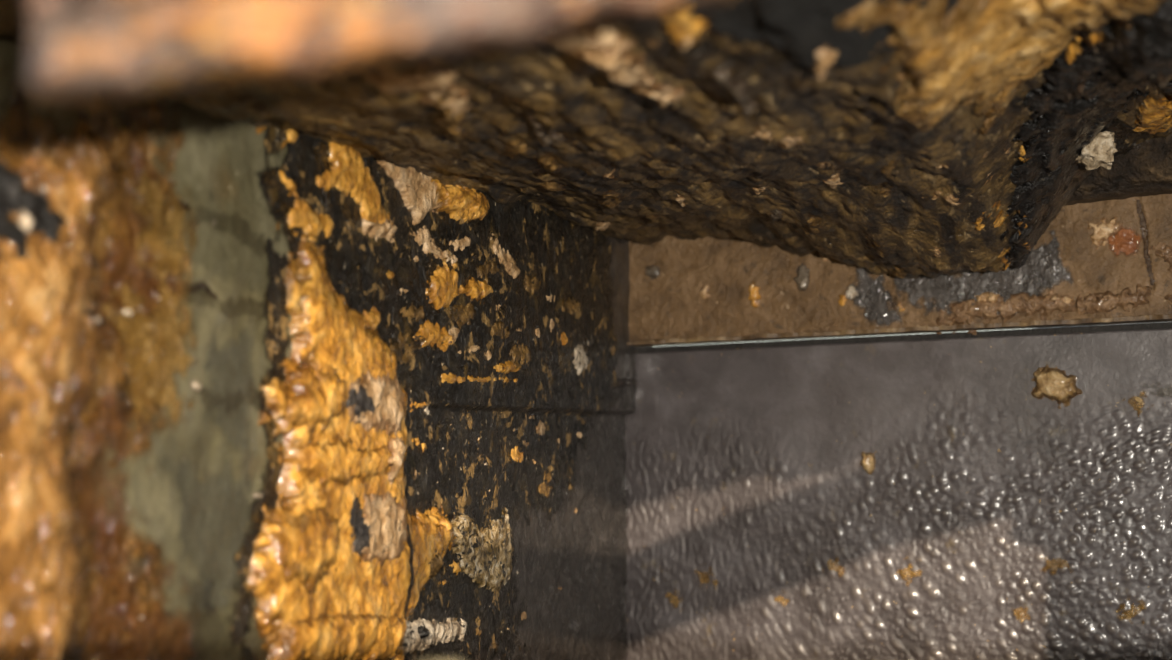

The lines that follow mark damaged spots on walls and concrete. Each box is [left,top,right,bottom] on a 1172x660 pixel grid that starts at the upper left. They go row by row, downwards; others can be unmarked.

peeling [545,8,709,109]
peeling [366,60,474,138]
peeling [282,129,298,150]
peeling [751,124,807,148]
peeling [276,171,334,242]
peeling [316,142,580,383]
peeling [971,200,1033,272]
rust [0,83,197,660]
peeling [511,415,553,497]
peeling [424,505,452,534]
peeling [428,550,461,585]
rust [897,557,922,586]